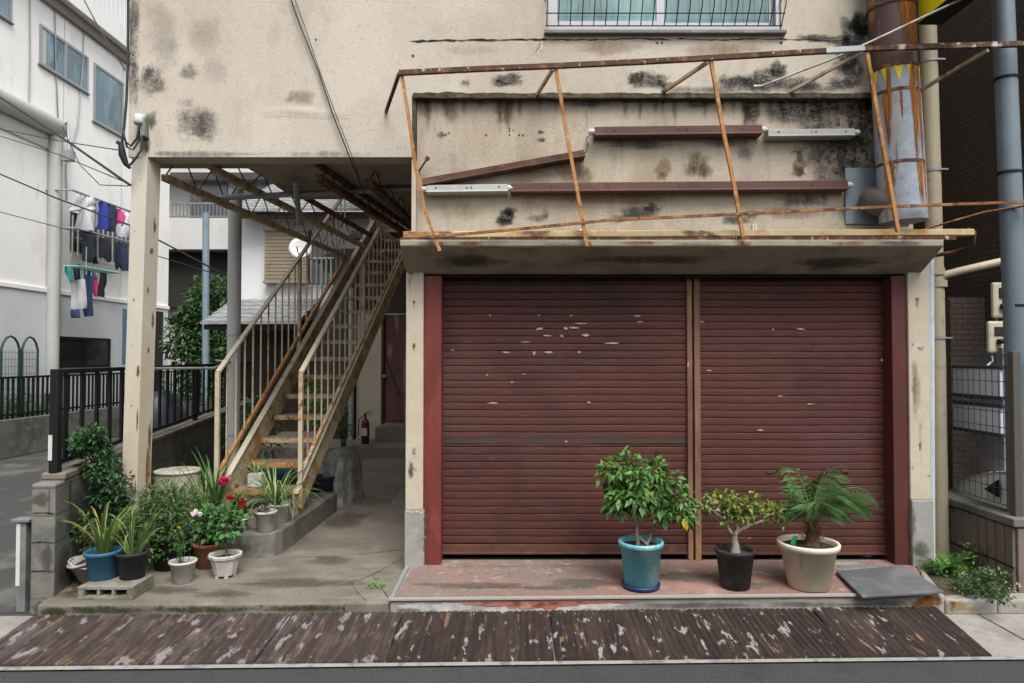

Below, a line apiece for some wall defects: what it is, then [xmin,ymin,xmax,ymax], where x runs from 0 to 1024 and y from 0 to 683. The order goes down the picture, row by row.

rust [900,0,917,40]
crack [410,37,834,53]
water stain [129,59,159,89]
water stain [494,74,522,86]
water stain [628,13,875,180]
water stain [183,112,214,136]
rust [882,64,927,200]
water stain [497,208,516,226]